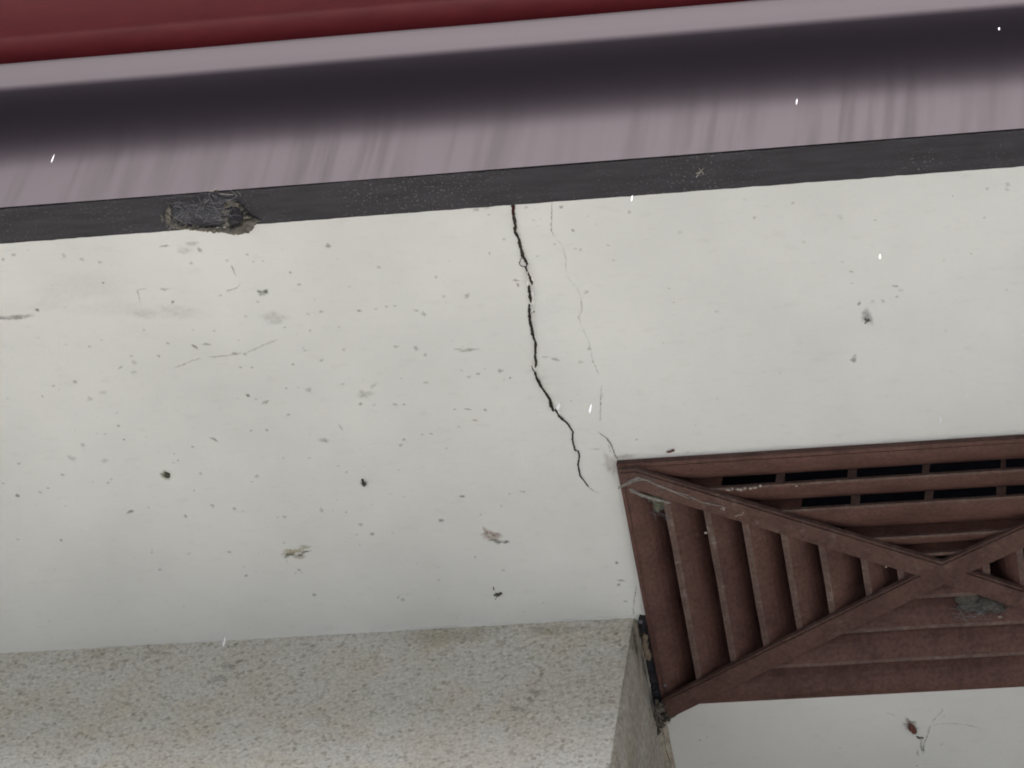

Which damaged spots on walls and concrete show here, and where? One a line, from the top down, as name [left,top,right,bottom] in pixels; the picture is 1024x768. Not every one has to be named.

crack [511,205,589,487]